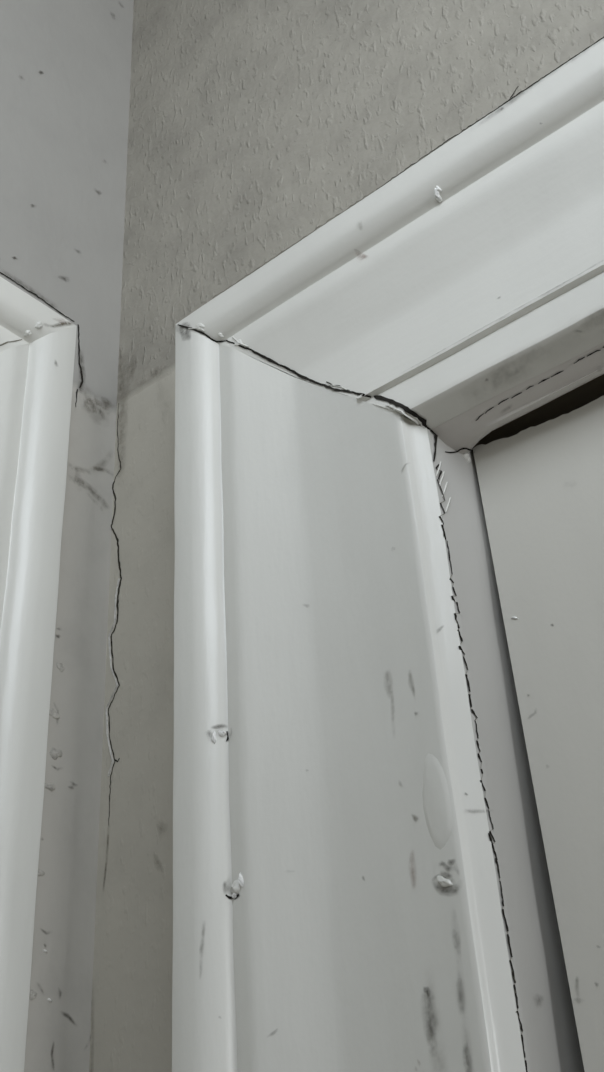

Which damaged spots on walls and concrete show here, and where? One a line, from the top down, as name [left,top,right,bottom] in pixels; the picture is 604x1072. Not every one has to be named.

crack [0,272,83,405]
crack [476,346,604,421]
crack [100,403,122,871]
crack [178,323,528,1072]